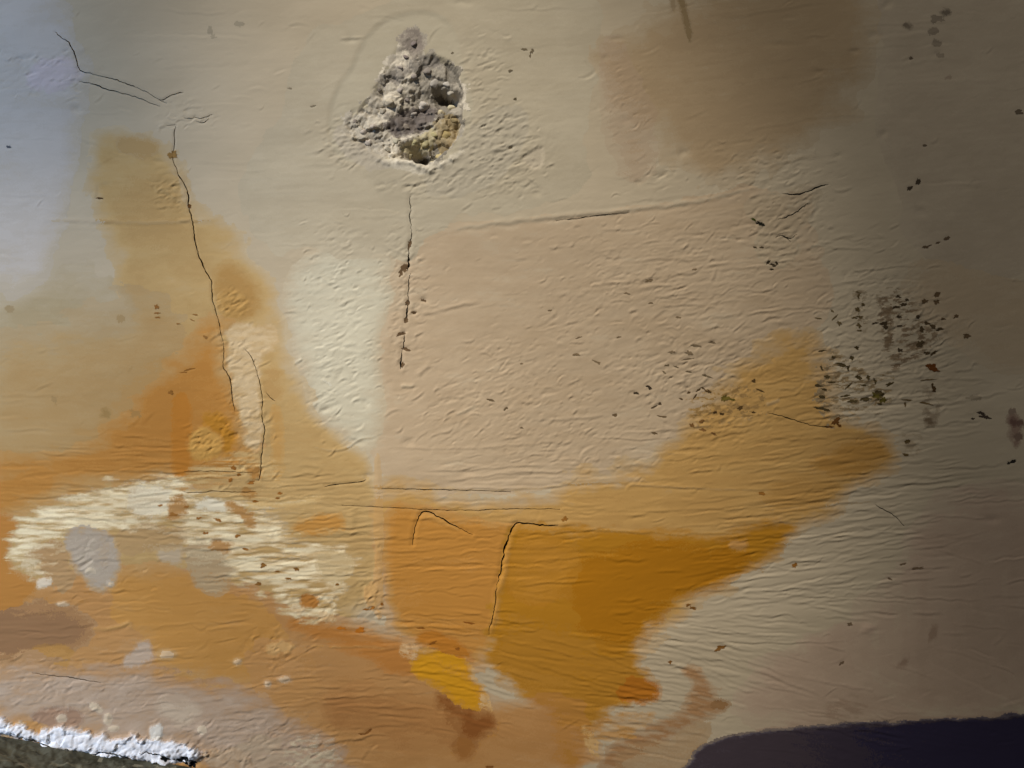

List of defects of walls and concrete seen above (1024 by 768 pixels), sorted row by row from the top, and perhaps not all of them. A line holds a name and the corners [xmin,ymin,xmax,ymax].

crack [57,34,235,411]
water stain [0,125,376,619]
crack [184,354,275,493]
crack [397,198,426,369]
hole [415,156,436,165]
hole [428,94,455,108]
water stain [377,0,1024,673]
crack [324,479,554,635]
efflorescence [0,716,208,766]